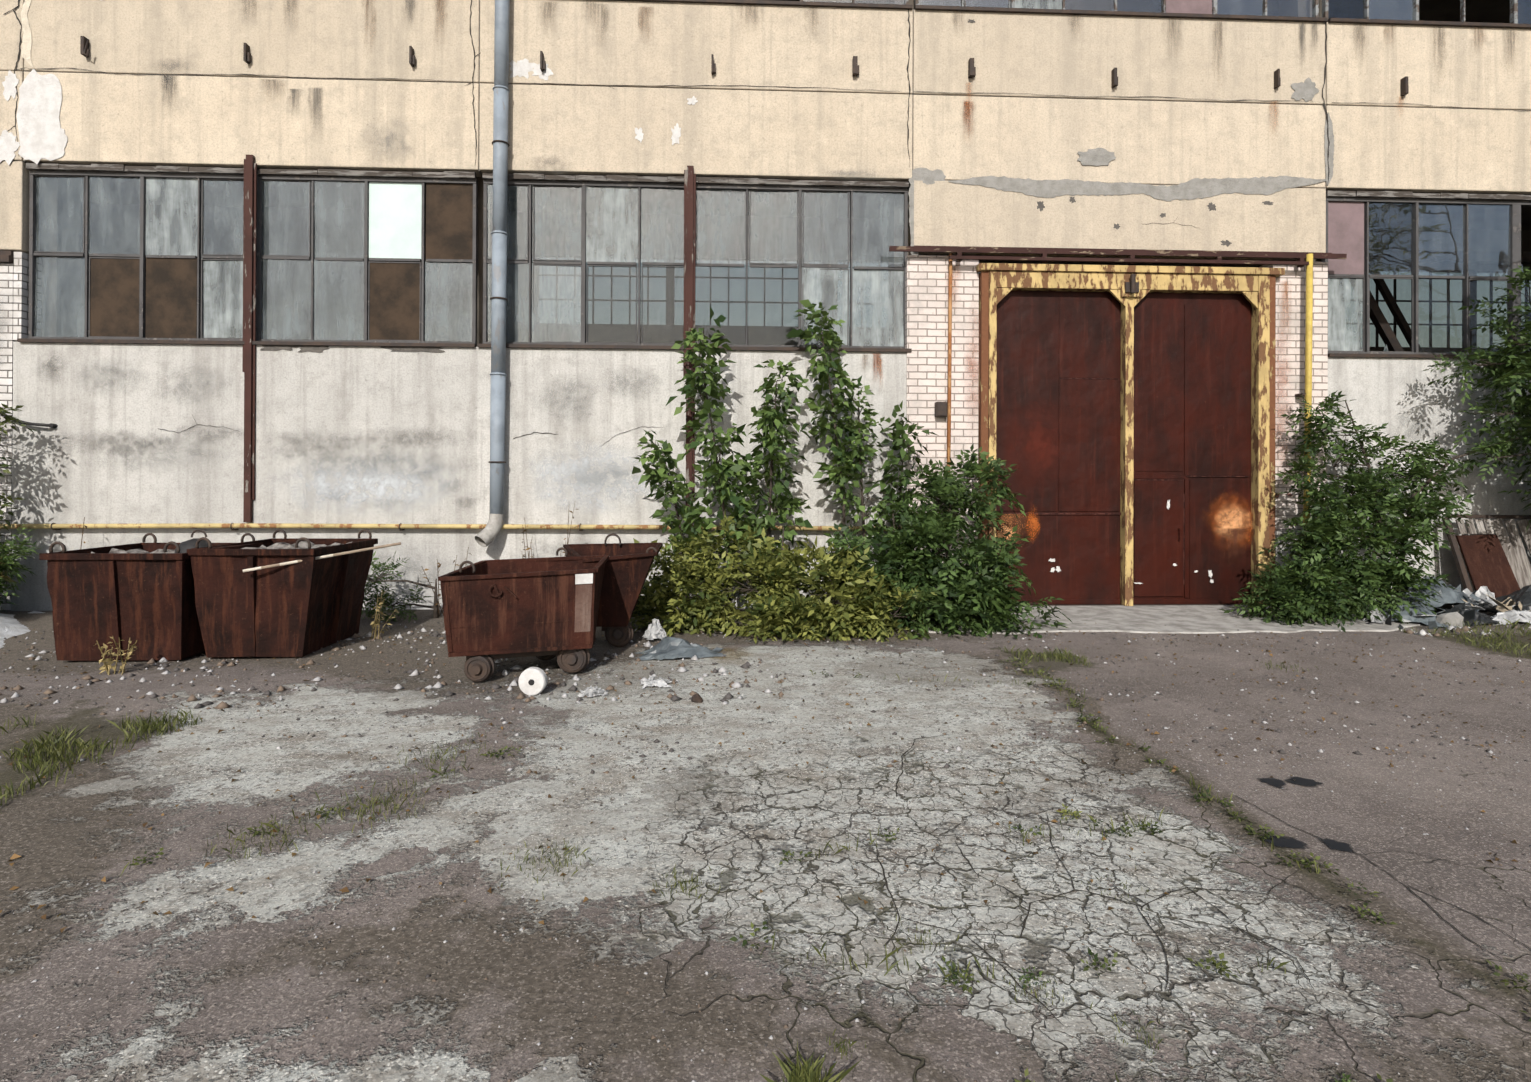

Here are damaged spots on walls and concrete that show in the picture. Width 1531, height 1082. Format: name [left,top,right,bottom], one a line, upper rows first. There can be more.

peeling [0,0,68,165]
rust [998,514,1039,538]
rust [1214,504,1250,549]
crack [895,733,956,797]
crack [873,841,900,946]
crack [1020,796,1531,976]